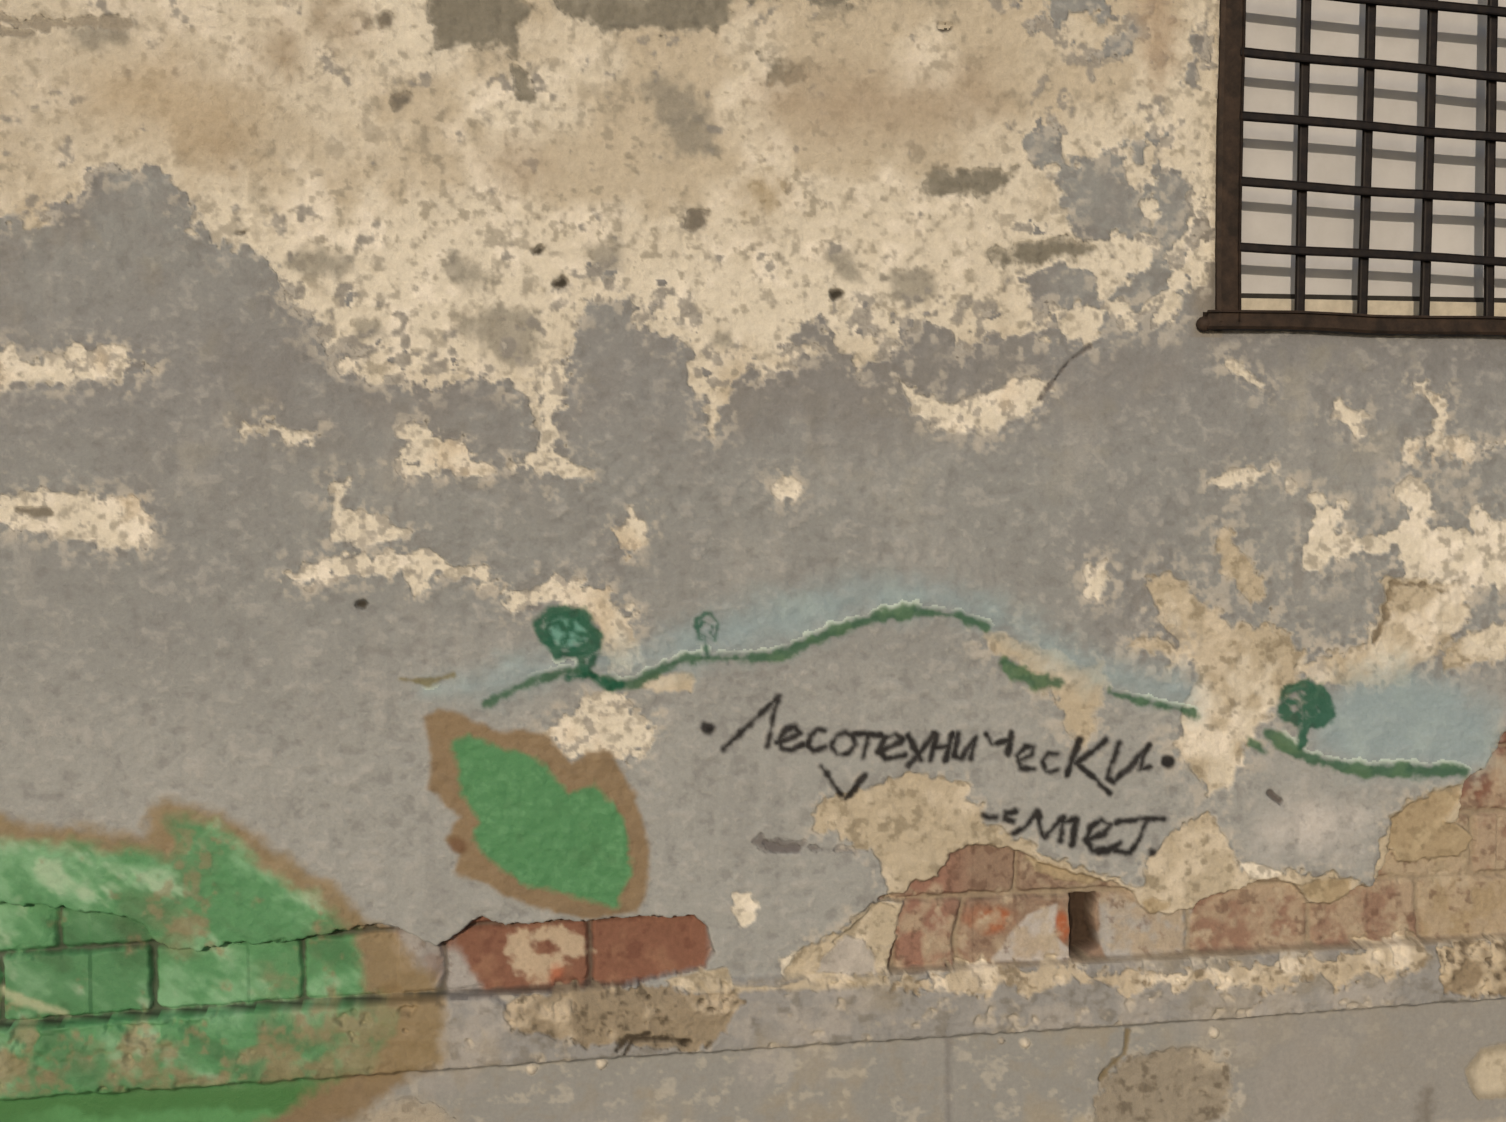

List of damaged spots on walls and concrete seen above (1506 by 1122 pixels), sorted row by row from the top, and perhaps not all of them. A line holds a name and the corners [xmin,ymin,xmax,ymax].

peeling [0,0,1220,479]
peeling [0,487,155,550]
spalling [779,379,1506,981]
peeling [731,891,759,928]
spalling [406,915,713,1000]
spalling [1093,1028,1233,1122]